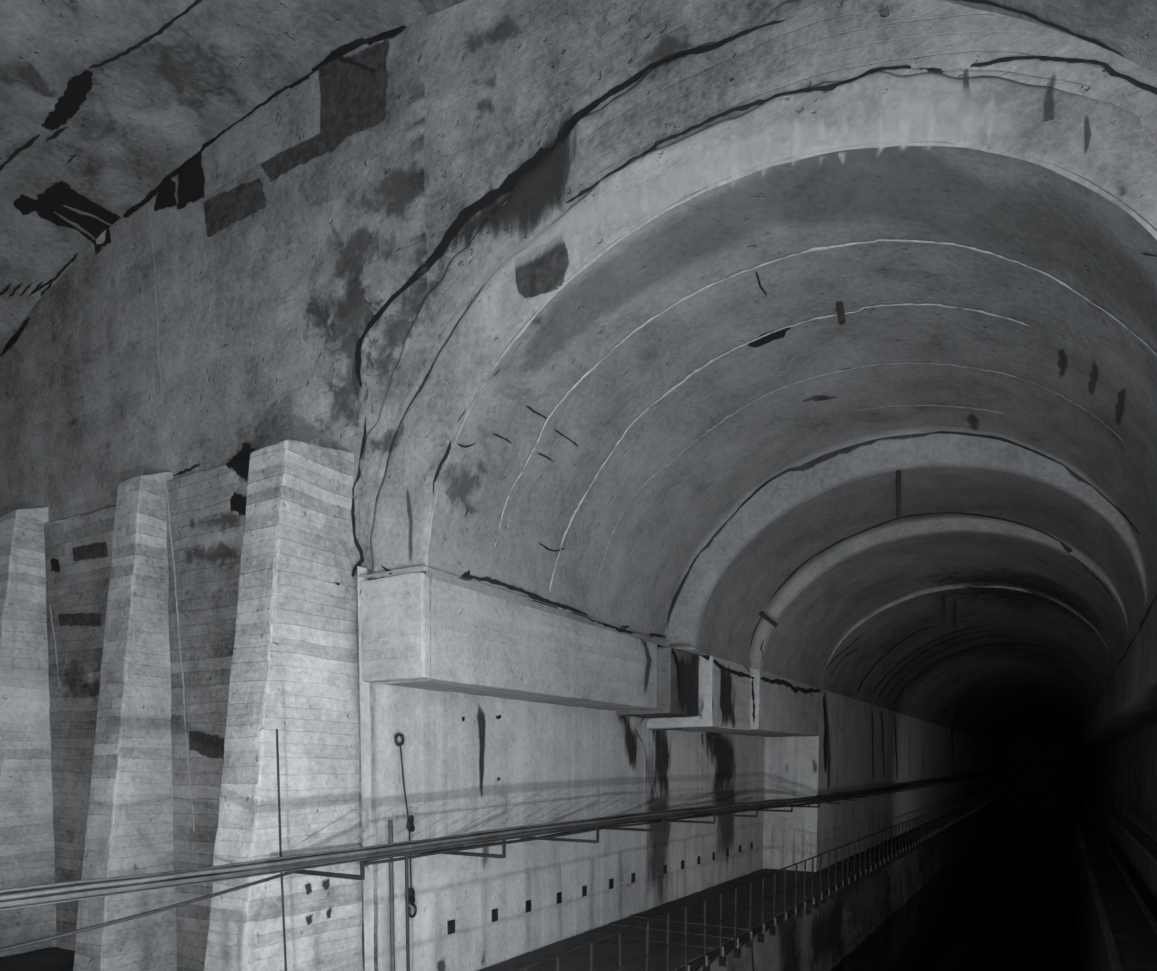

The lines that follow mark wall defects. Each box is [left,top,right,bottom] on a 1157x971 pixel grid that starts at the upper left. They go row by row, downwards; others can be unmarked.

spalling [0,253,78,297]
spalling [41,70,93,142]
spalling [13,181,121,254]
crack [123,26,407,218]
peeling [154,40,389,237]
peeling [515,235,569,298]
crack [355,19,787,387]
crack [566,0,1157,204]
crack [333,417,392,595]
crack [433,405,578,496]
water stain [619,715,682,903]
water stain [702,668,736,857]